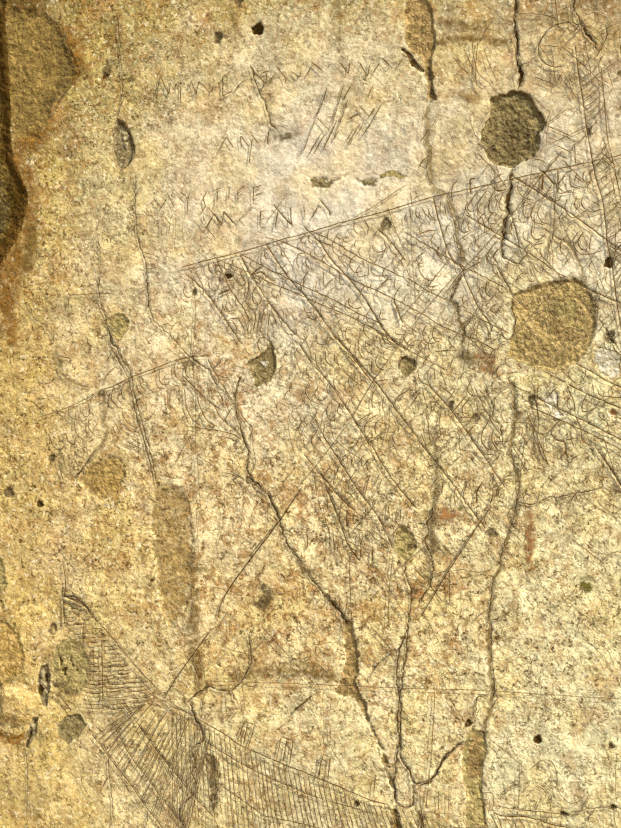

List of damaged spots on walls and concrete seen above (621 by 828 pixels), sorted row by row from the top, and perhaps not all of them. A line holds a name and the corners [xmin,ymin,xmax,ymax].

spalling [112,119,135,171]
spalling [481,90,547,168]
crack [68,234,177,481]
spalling [246,341,276,388]
crack [127,0,621,828]
crack [80,758,148,828]